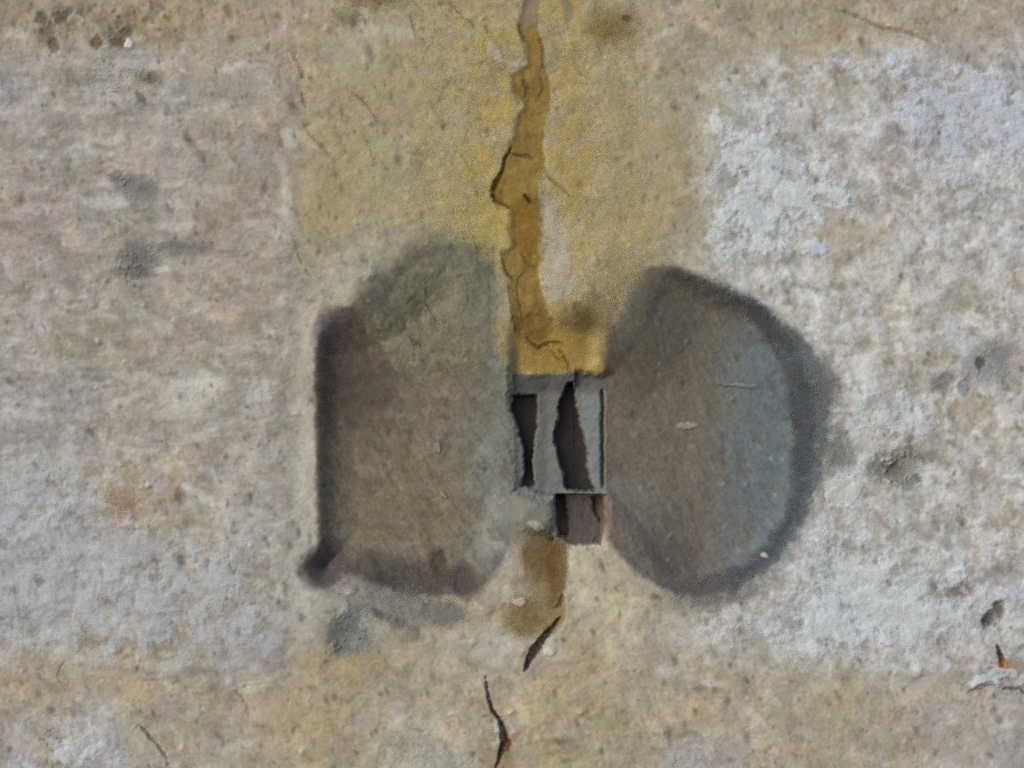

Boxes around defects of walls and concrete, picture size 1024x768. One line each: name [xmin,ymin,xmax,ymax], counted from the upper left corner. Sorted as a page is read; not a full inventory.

crack [492,0,566,361]
peeling [528,521,545,532]
crack [524,536,567,671]
crack [486,683,511,767]